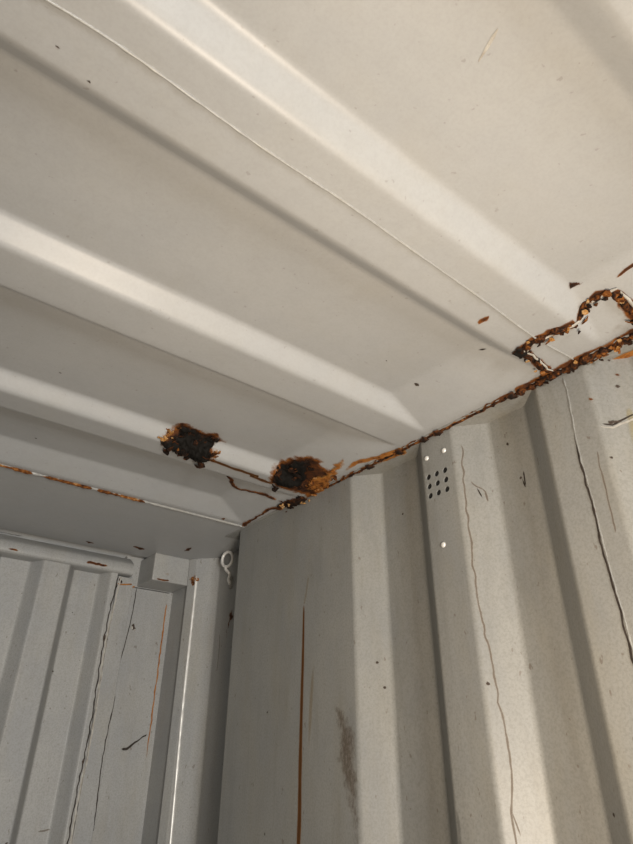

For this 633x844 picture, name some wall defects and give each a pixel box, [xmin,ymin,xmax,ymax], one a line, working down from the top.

rust [157,288,633,527]